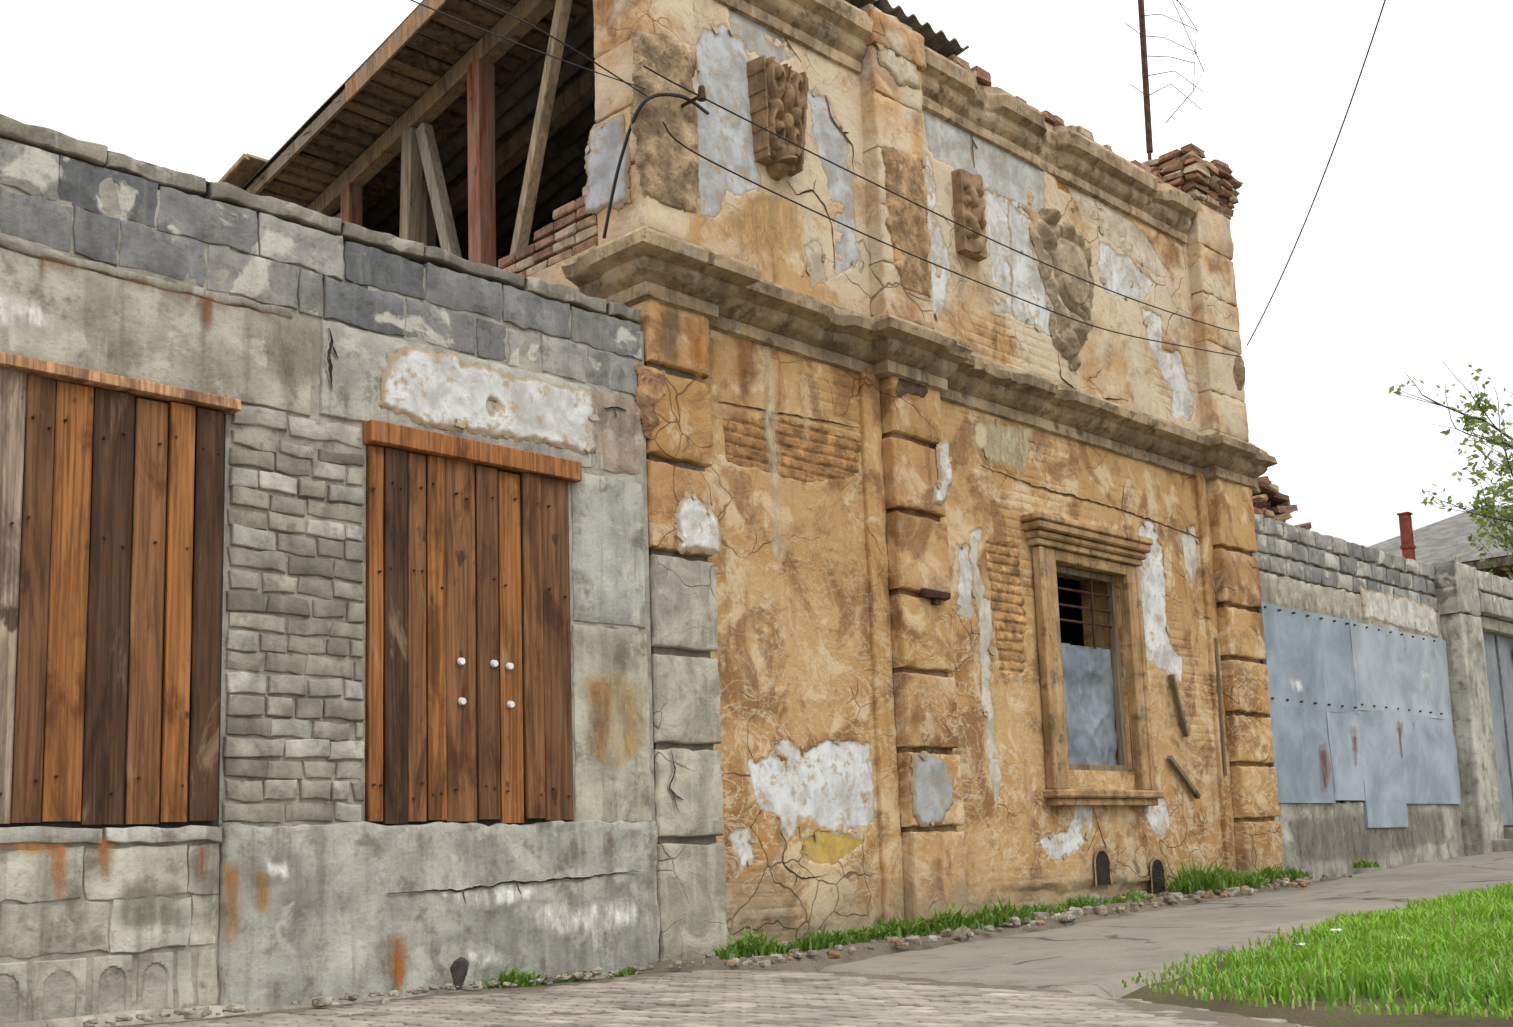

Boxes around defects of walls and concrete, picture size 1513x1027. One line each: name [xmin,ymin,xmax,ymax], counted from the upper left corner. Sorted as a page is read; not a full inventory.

spalling [582,9,794,218]
peeling [876,43,920,90]
peeling [803,86,861,289]
spalling [880,110,1194,421]
peeling [379,346,600,455]
peeling [674,491,722,555]
peeling [1138,516,1183,684]
peeling [1181,526,1199,587]
peeling [729,826,754,867]
crack [782,845,826,886]
peeling [747,739,875,865]